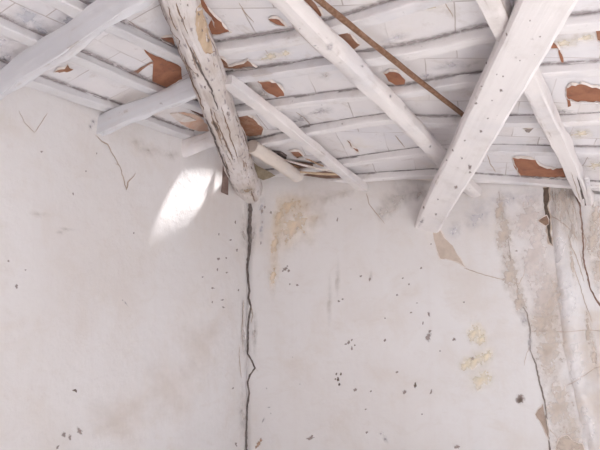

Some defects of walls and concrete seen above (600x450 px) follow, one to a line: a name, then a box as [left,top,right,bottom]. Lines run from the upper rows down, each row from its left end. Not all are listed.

peeling [200,0,232,36]
peeling [339,33,361,49]
peeling [129,50,182,88]
peeling [258,80,285,97]
peeling [383,69,405,86]
peeling [565,81,600,107]
peeling [239,115,265,138]
crack [97,136,135,190]
peeling [512,156,566,179]
flaking render [433,229,466,268]
crack [239,203,256,450]
crack [465,194,600,450]